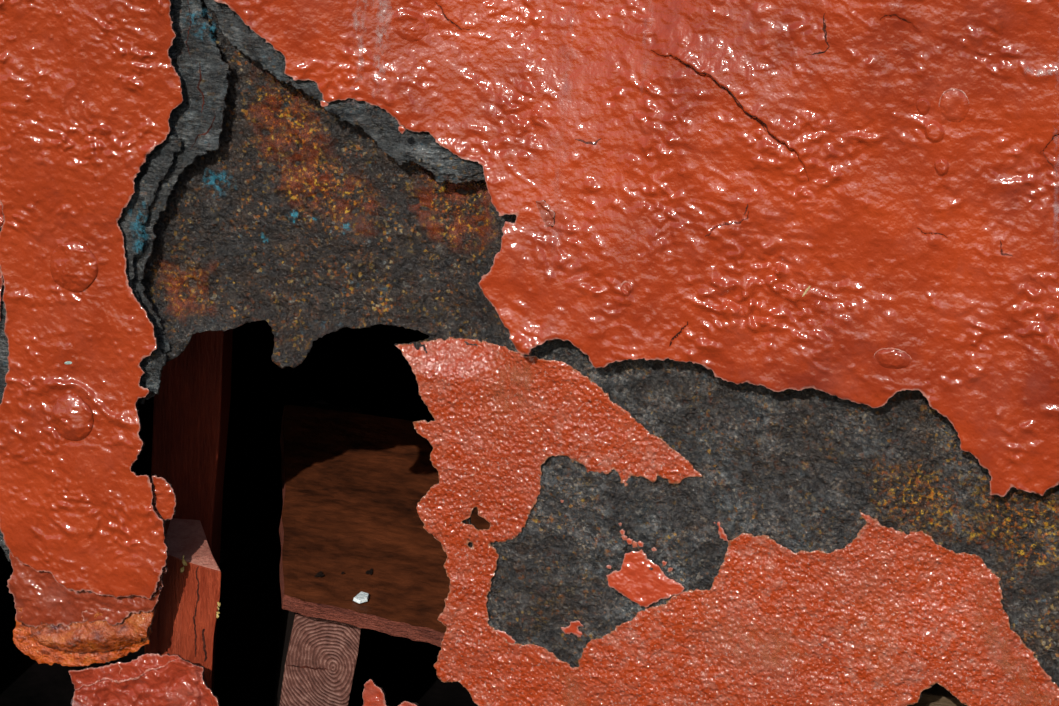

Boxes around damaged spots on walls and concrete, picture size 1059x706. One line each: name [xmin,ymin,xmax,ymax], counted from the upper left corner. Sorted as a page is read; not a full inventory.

crack [436,3,470,30]
crack [651,50,809,181]
spalling [119,0,485,405]
rust [142,0,518,369]
peeling [618,523,673,572]
peeling [714,522,729,542]
rust [487,339,1059,686]
peeling [495,630,515,644]
peeling [561,620,584,638]